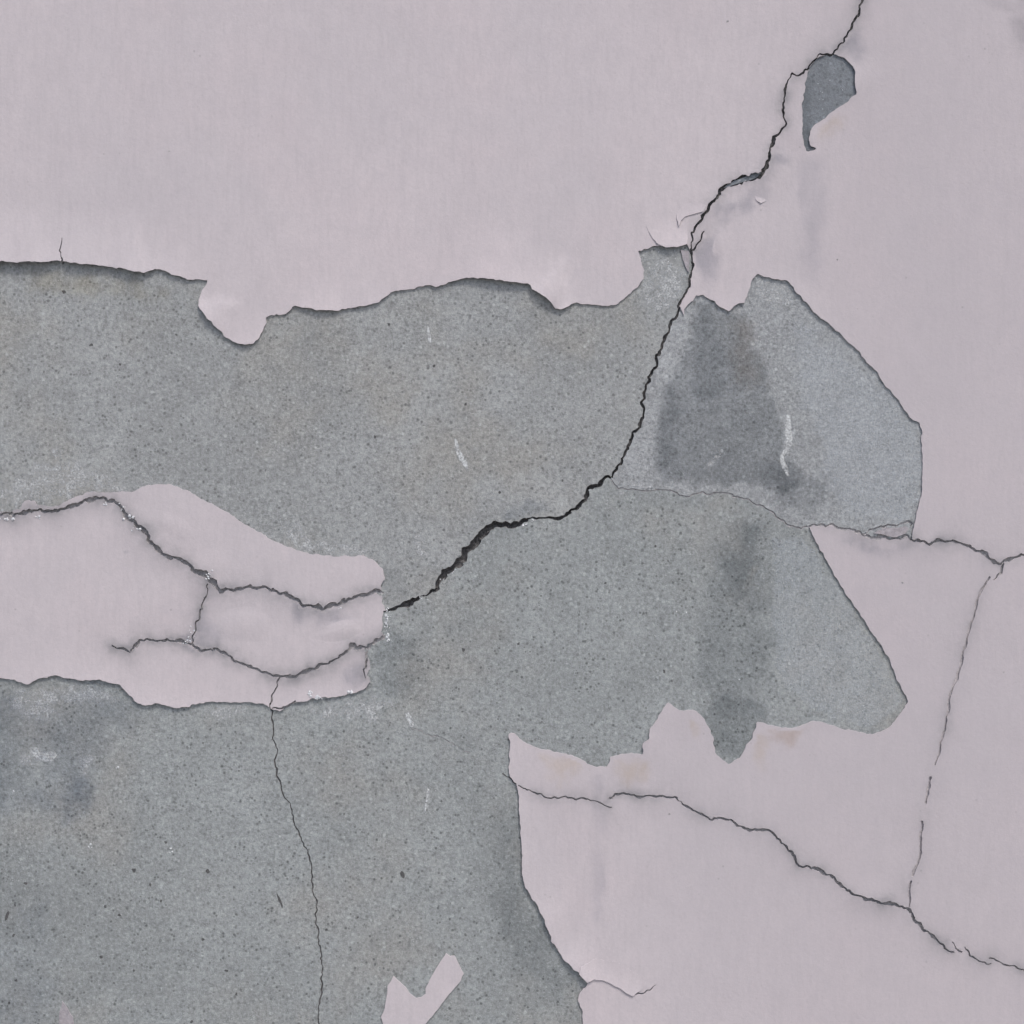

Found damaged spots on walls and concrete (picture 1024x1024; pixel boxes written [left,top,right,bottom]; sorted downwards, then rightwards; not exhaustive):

peeling [802,52,856,152]
crack [0,496,385,1024]
peeling [0,241,923,1024]
crack [384,0,1024,803]
crack [502,773,1024,971]
efflorescence [780,414,792,475]